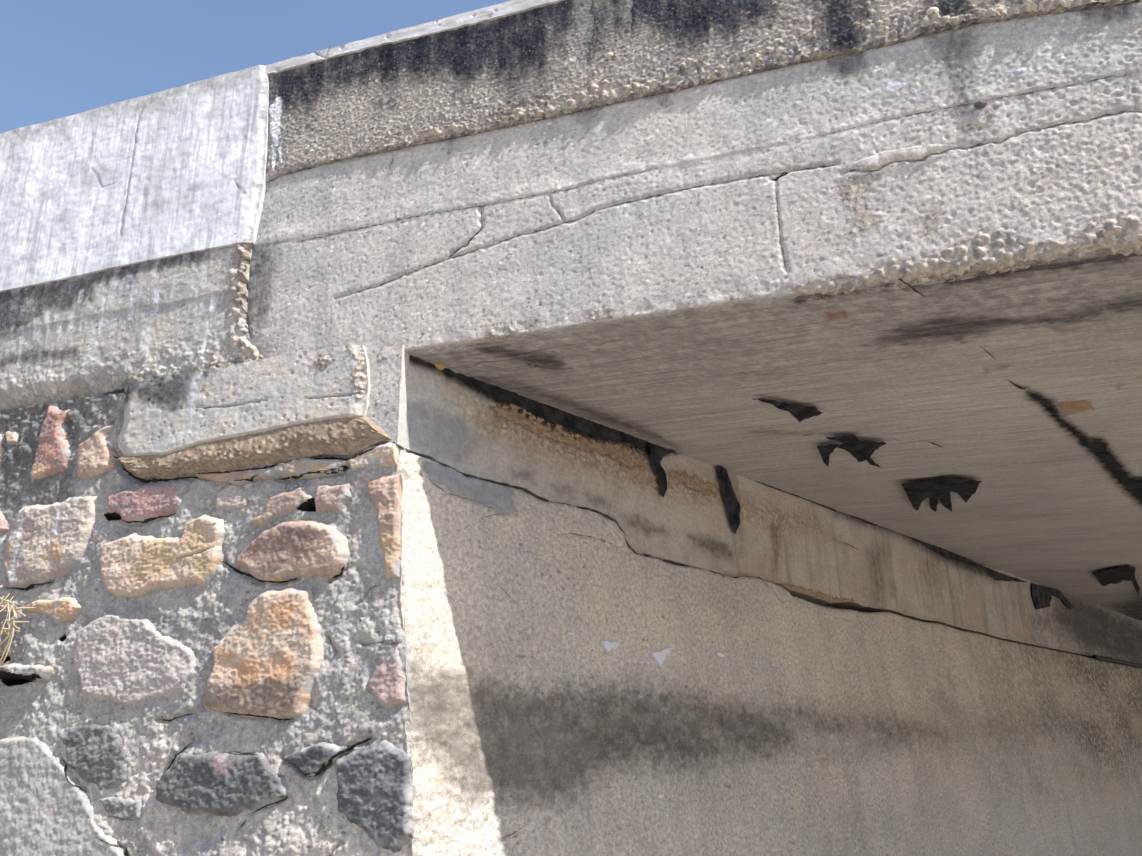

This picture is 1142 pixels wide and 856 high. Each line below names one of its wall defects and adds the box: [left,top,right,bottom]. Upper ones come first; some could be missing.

water stain [273,0,573,108]
water stain [588,0,772,44]
crack [302,111,1140,298]
water stain [0,252,202,367]
crack [408,452,547,531]
spalling [490,403,741,534]
peeling [752,398,822,422]
peeling [817,434,887,468]
peeling [901,478,982,512]
crack [983,349,1142,503]
water stain [411,669,792,802]
crack [96,837,129,856]